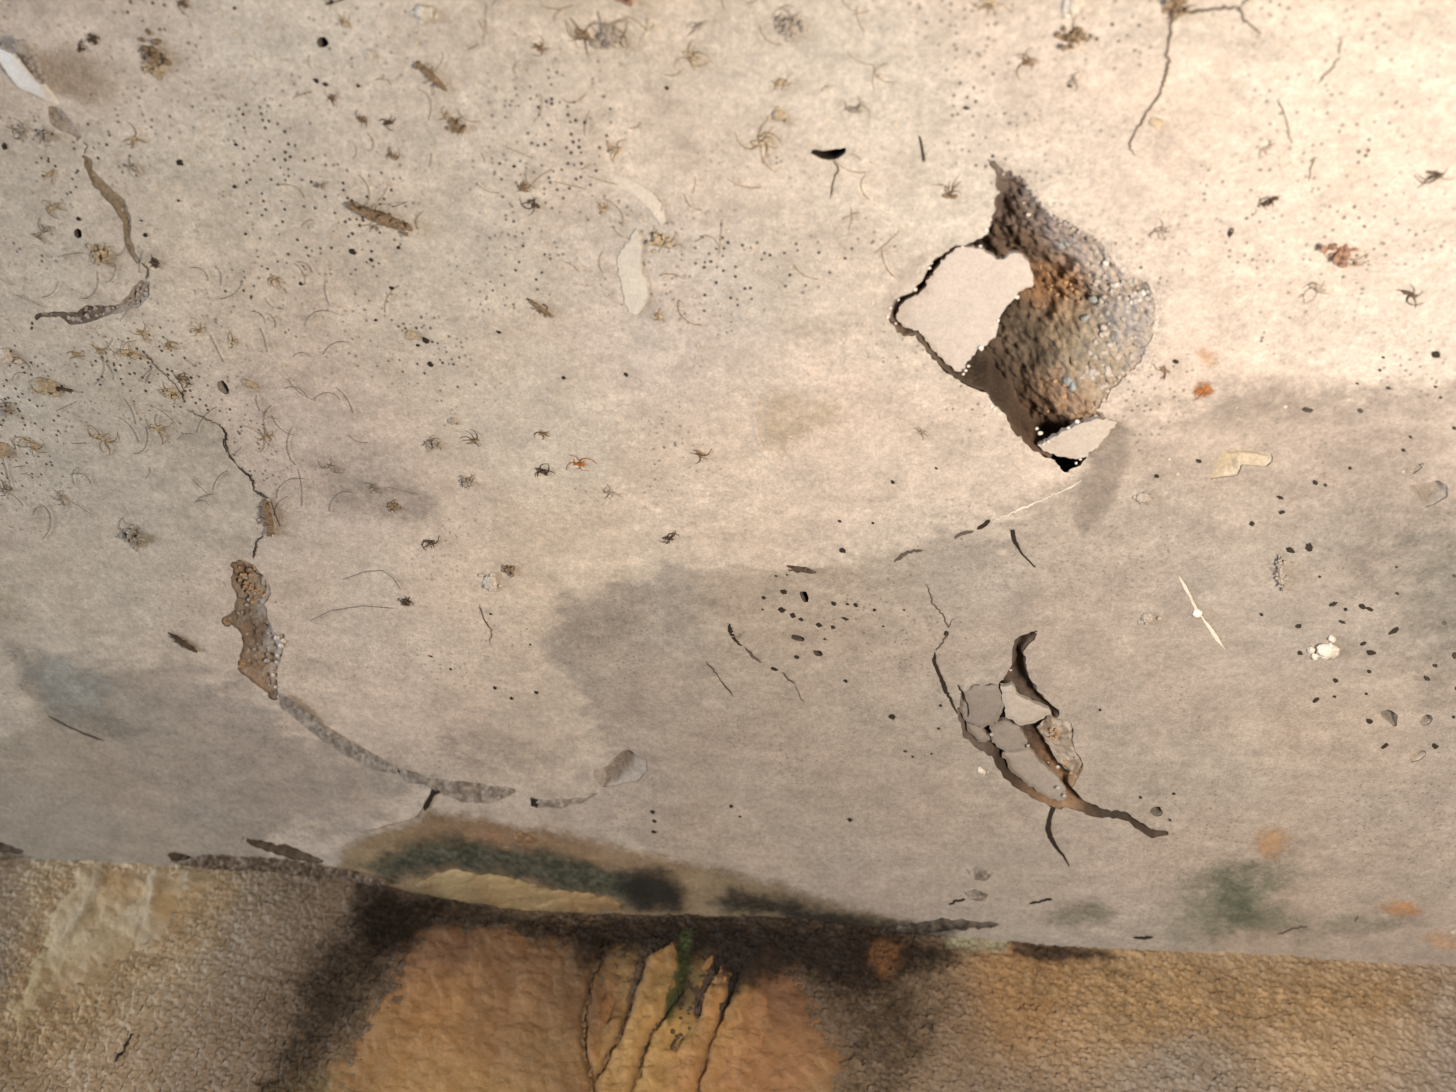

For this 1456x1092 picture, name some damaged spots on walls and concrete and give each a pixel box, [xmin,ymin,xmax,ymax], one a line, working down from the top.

crack [1128,0,1262,156]
crack [30,106,150,330]
spalling [886,157,1165,464]
spalling [221,560,648,811]
crack [894,480,1169,866]
leakage [257,811,952,1092]
crack [1029,897,1052,905]
crack [1133,934,1153,942]
crack [1278,925,1308,935]